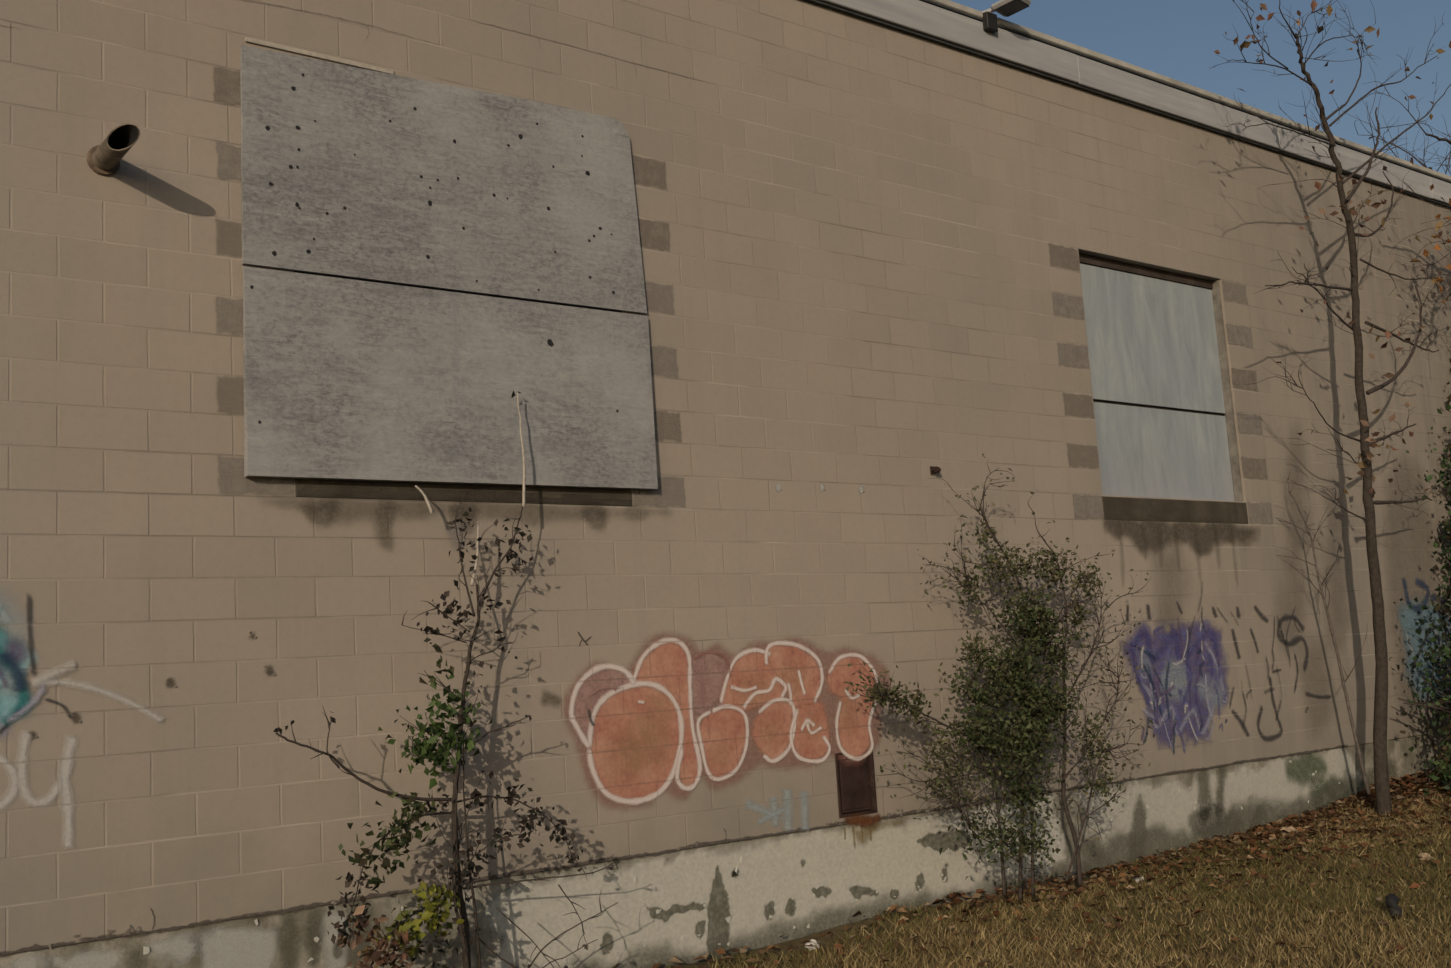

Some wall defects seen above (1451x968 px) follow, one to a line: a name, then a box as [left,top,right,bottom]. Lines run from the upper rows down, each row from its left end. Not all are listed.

leakage [1105,516,1253,554]